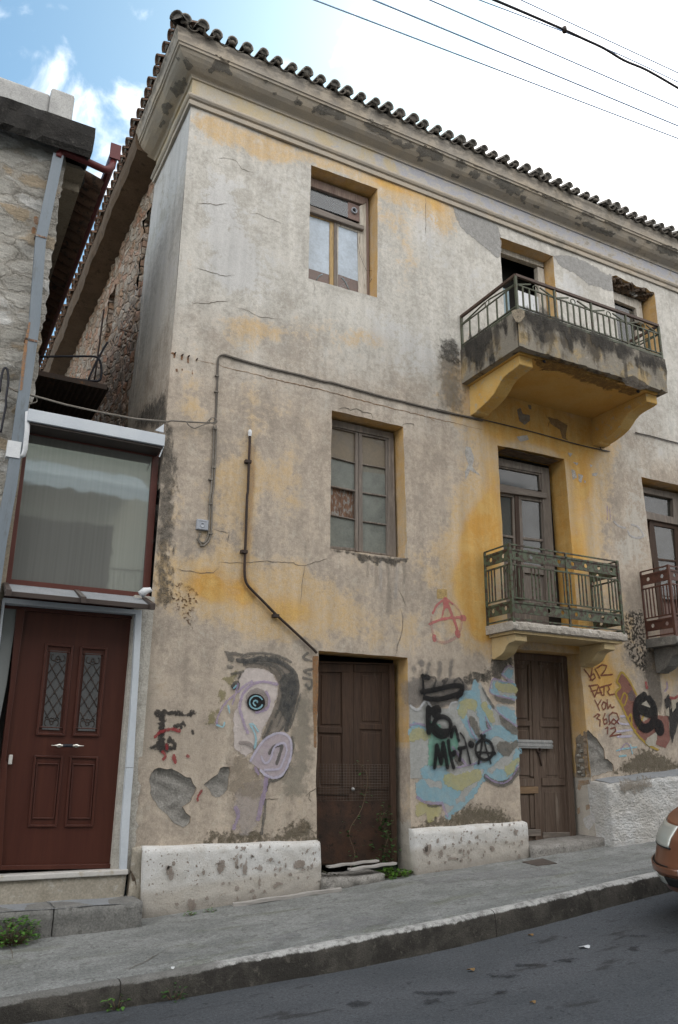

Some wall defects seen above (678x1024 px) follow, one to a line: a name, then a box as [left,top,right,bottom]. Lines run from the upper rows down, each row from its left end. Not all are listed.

flaking render [206,54,232,76]
flaking render [364,119,678,258]
leakage [440,319,507,410]
leakage [535,358,641,395]
leakage [526,306,667,371]
leakage [135,394,177,603]
crack [176,531,325,602]
flaking render [575,730,614,790]
flaking render [149,767,230,828]